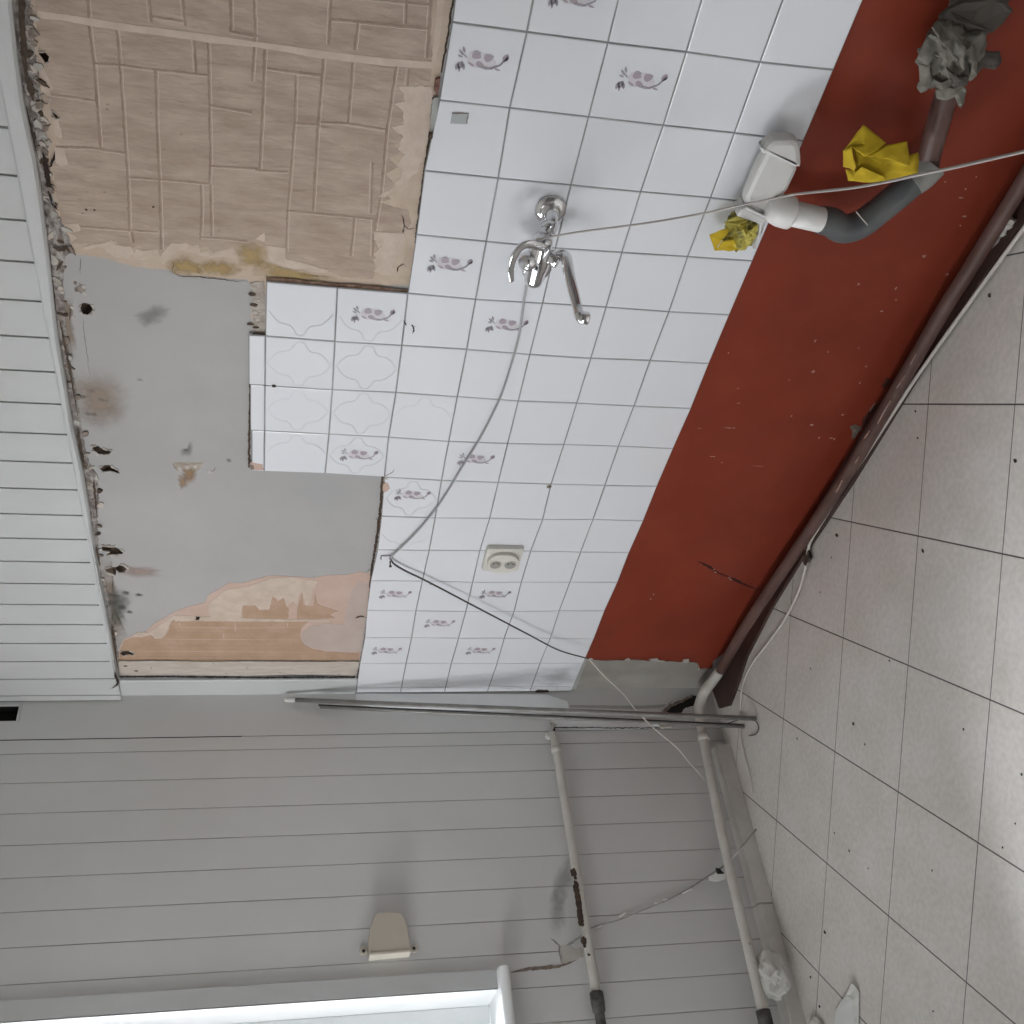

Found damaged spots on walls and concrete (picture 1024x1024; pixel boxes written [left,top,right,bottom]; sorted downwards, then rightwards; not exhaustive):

spalling [428,77,440,140]
flaking render [12,0,360,678]
crack [697,561,761,590]